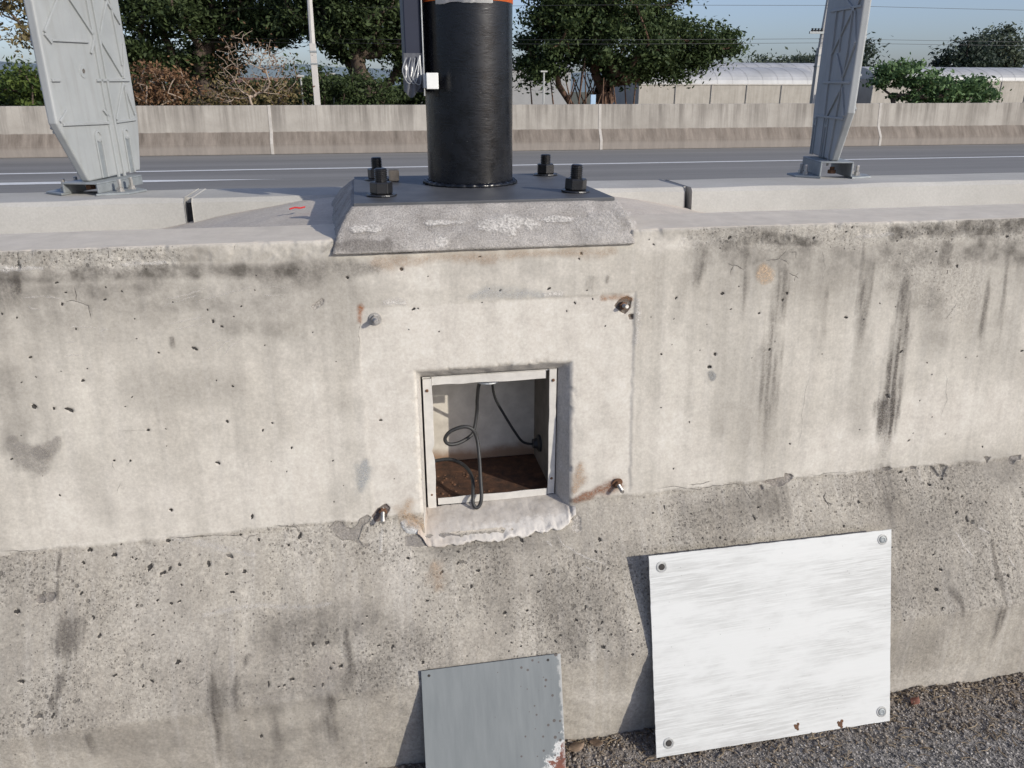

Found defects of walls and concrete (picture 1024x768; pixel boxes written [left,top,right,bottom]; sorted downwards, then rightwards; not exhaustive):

damp [878,290,909,433]
rust [572,464,623,502]